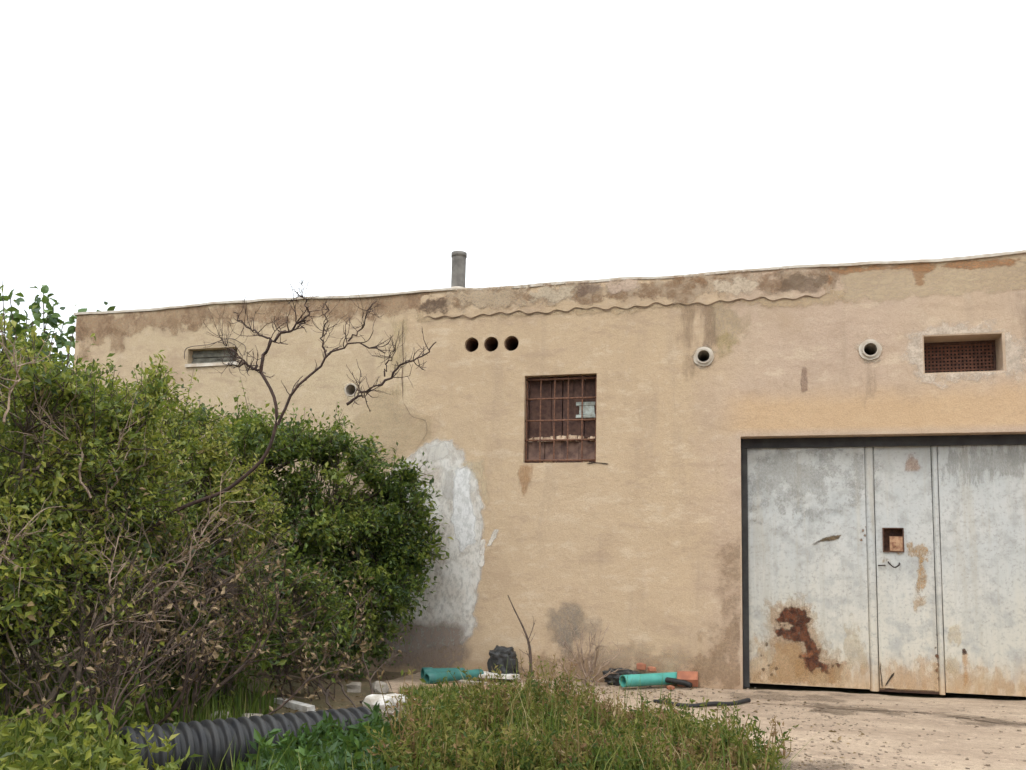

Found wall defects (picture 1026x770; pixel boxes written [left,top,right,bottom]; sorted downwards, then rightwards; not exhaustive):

damp [75,254,1026,368]
crack [401,295,824,445]
peeling [375,440,499,670]
rust [898,542,928,590]
rust [766,607,840,674]